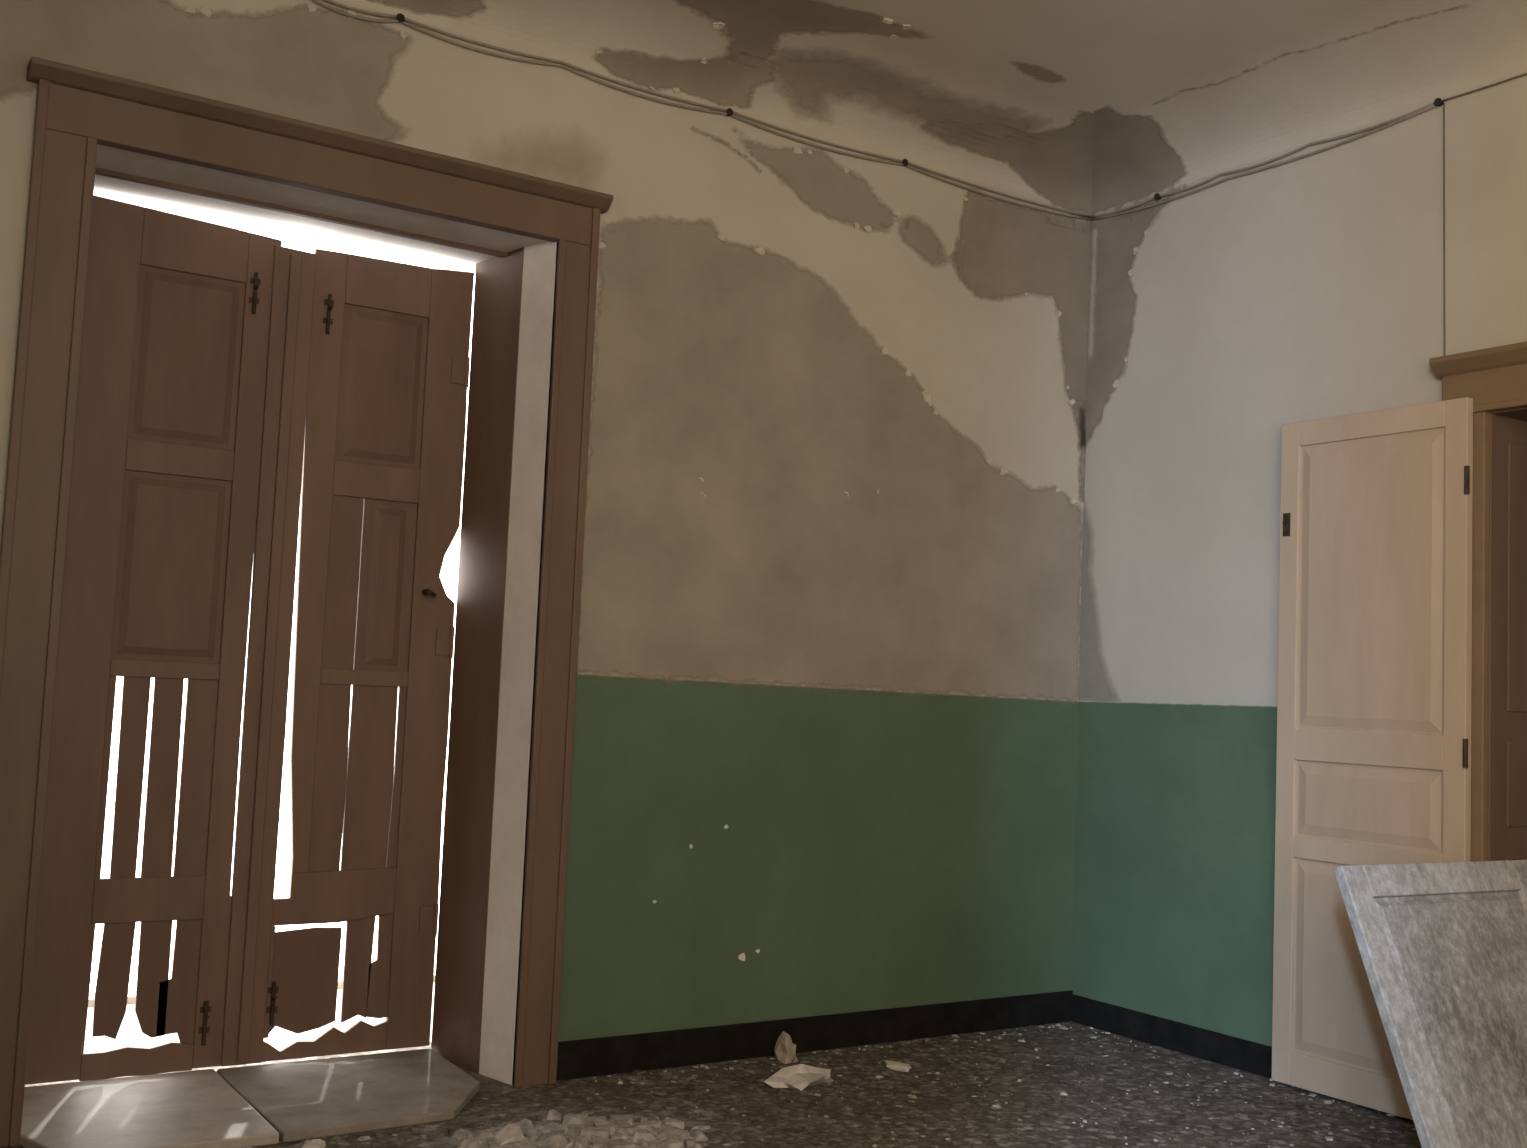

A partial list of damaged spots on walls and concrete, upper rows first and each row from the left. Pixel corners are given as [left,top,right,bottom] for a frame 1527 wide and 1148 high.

peeling [0,0,409,141]
peeling [595,0,924,108]
peeling [702,133,947,265]
peeling [577,218,1083,702]